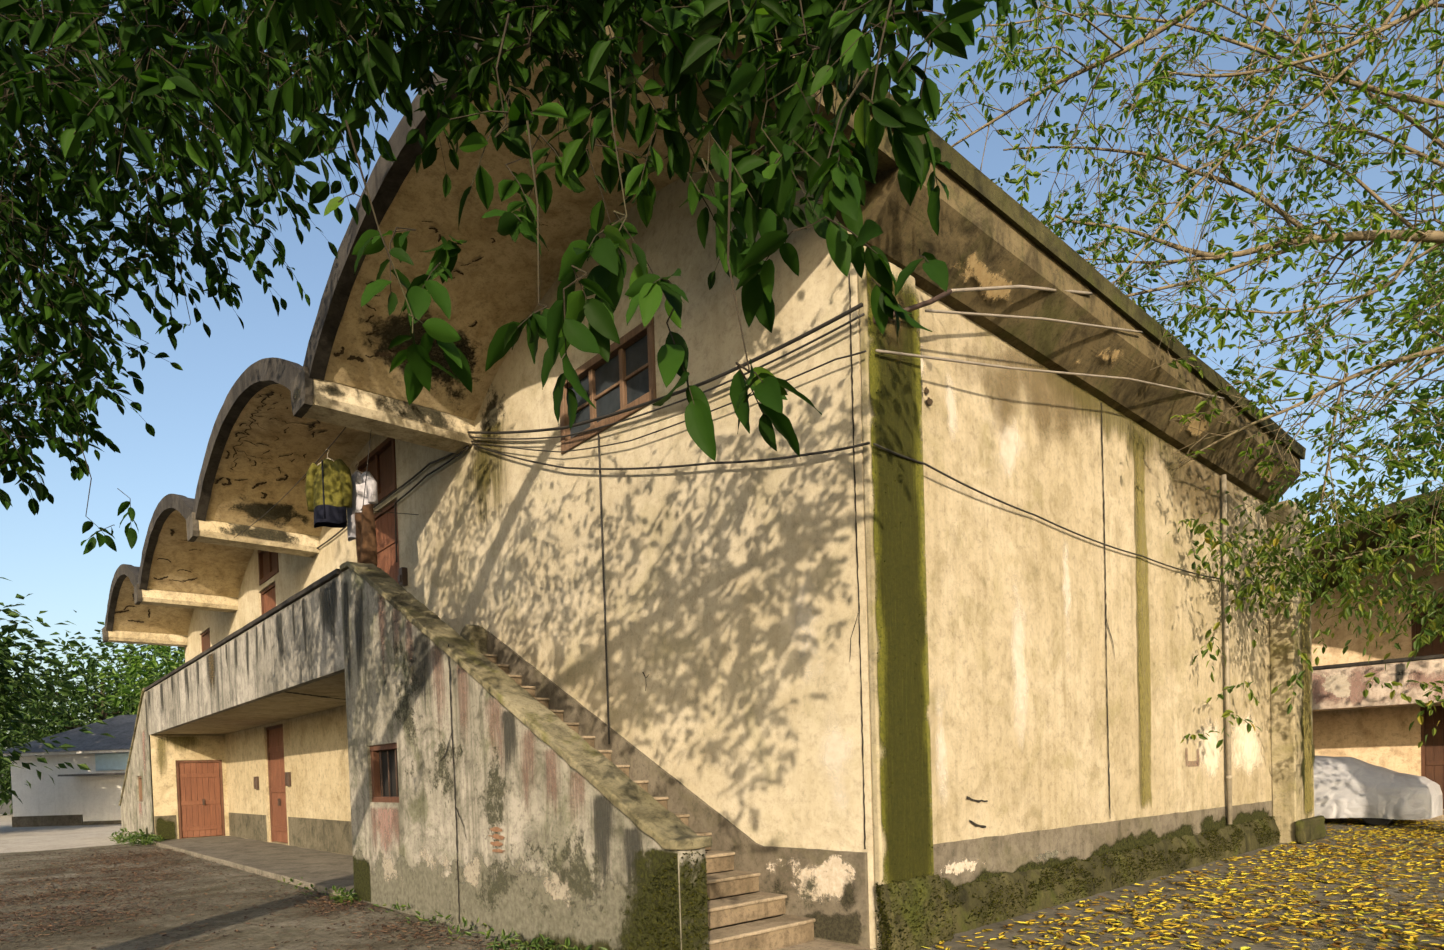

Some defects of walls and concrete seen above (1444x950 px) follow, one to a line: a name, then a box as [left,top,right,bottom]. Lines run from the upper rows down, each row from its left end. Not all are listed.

flaking render [964,252,1012,299]
leakage [360,310,505,518]
leakage [221,494,309,544]
leakage [148,580,363,712]
leakage [384,634,431,746]
peeling [1312,667,1383,704]
leakage [405,742,463,807]
leakage [471,711,642,926]
flaking render [354,827,638,950]
flaking render [766,855,856,904]